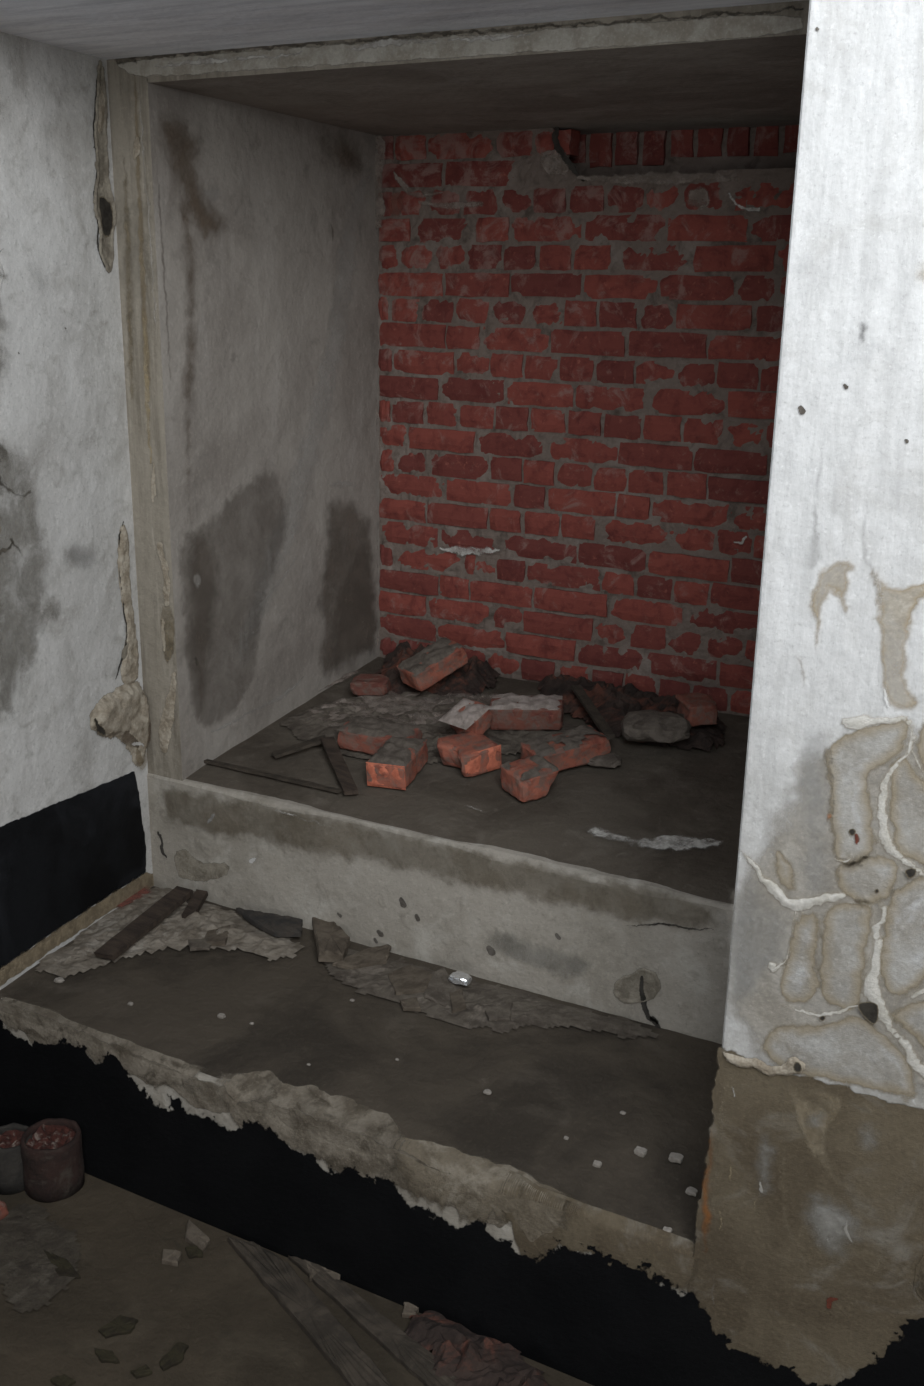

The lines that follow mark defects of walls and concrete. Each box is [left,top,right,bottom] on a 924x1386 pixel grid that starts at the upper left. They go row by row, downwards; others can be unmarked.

leakage [0,446,55,709]
leakage [322,507,376,670]
peeling [0,715,924,1386]